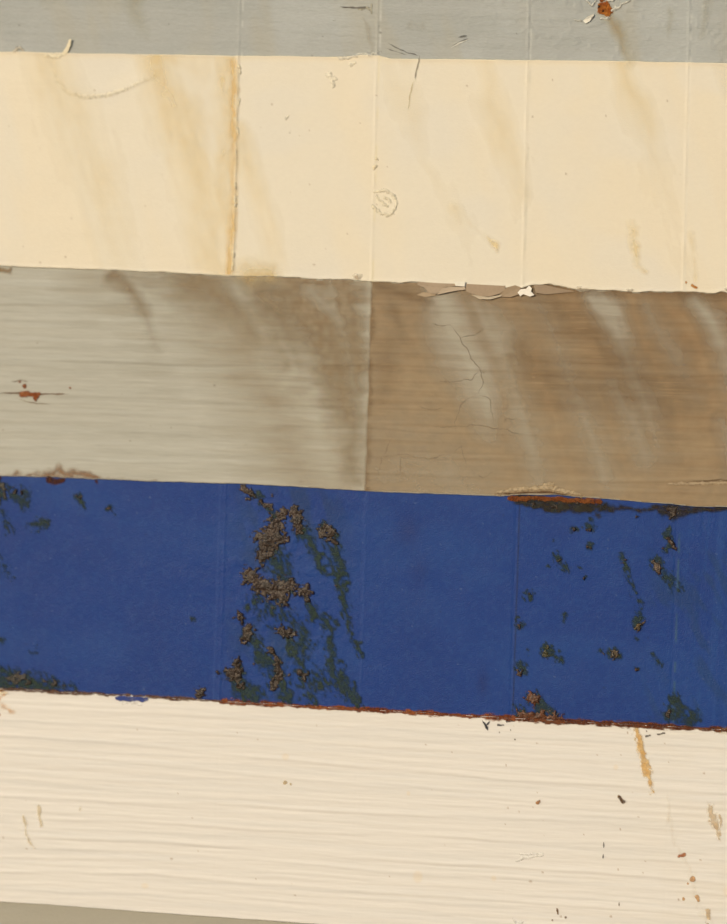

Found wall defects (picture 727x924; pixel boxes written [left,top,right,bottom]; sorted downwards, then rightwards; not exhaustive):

corrosion [574,0,631,23]
damp [178,275,238,310]
peeling [418,281,590,299]
corrosion [5,380,71,404]
damp [246,277,727,506]
corrosion [15,467,99,484]
corrosion [0,476,727,792]